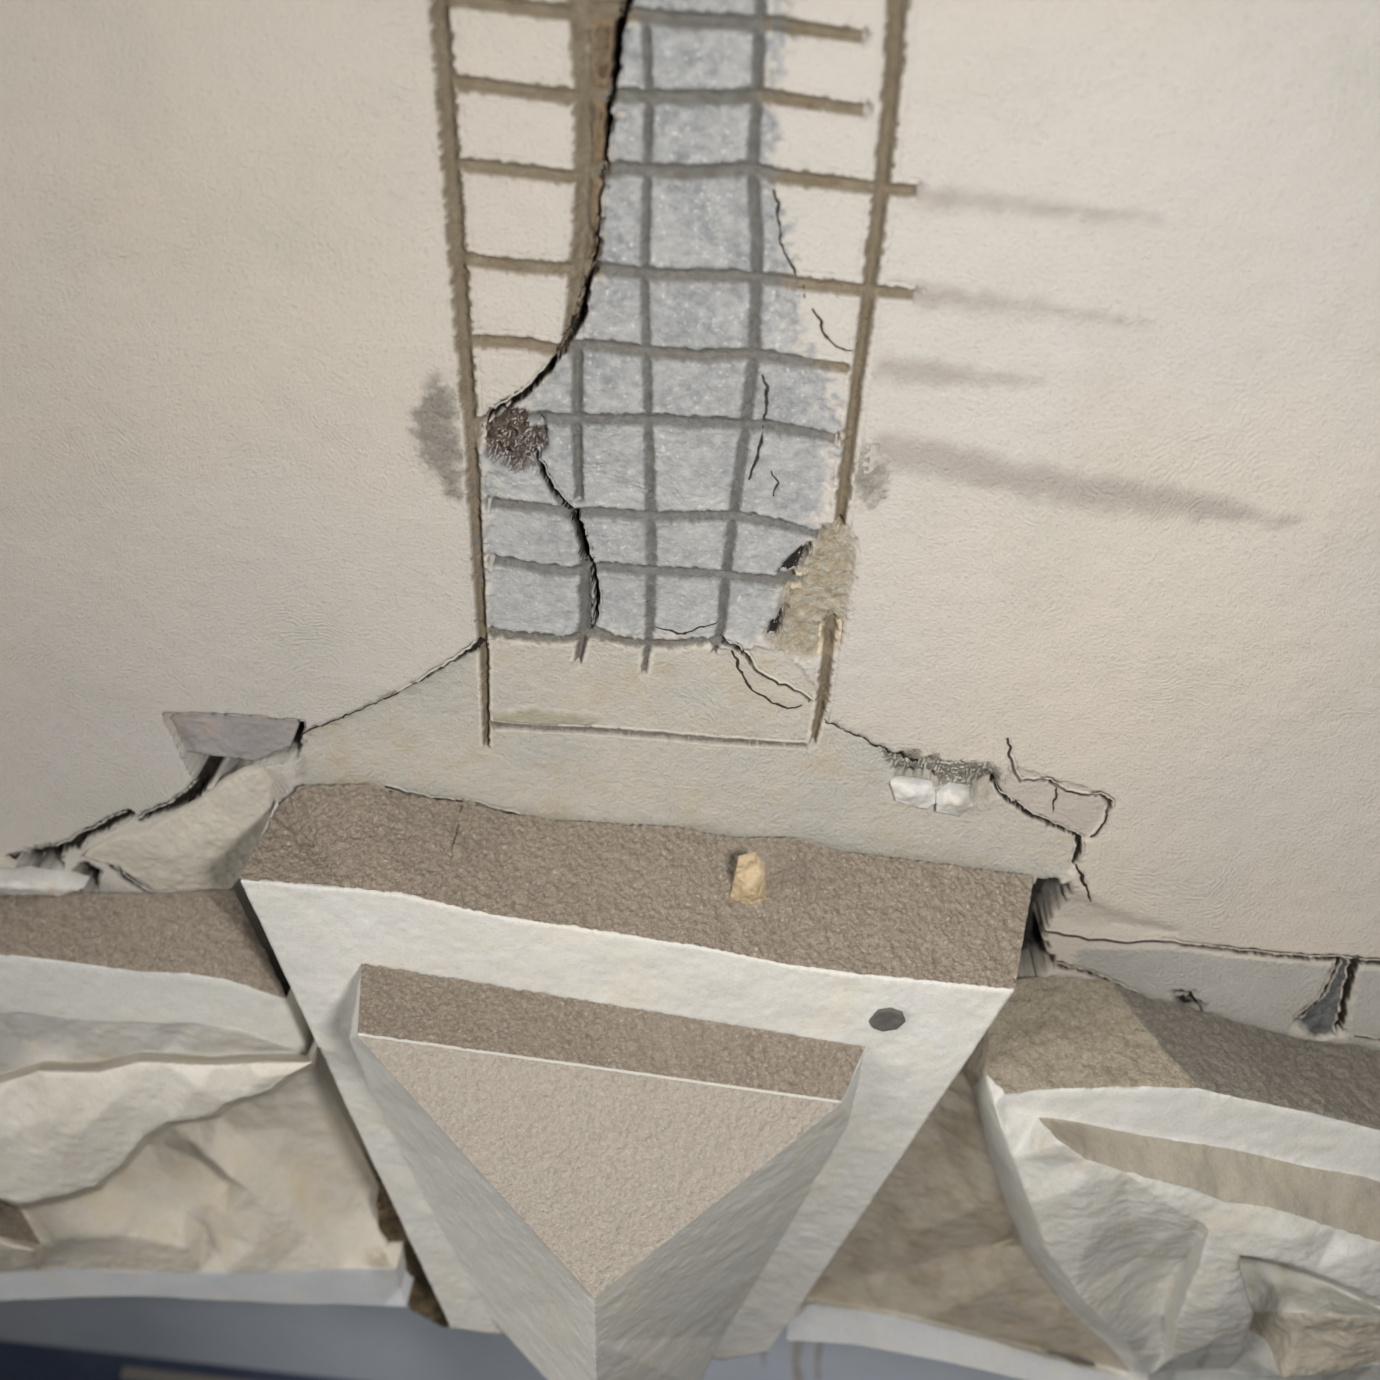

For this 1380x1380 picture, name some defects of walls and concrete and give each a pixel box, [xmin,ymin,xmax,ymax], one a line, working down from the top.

spalling [596,108,638,158]
crack [484,0,636,422]
spalling [594,183,637,260]
spalling [767,188,807,271]
spalling [581,283,637,339]
crack [533,446,602,628]
spalling [163,357,1197,1094]
crack [656,621,918,762]
peeling [0,842,103,897]
crack [9,755,230,894]
crack [989,737,1115,902]
crack [1041,906,1380,1042]